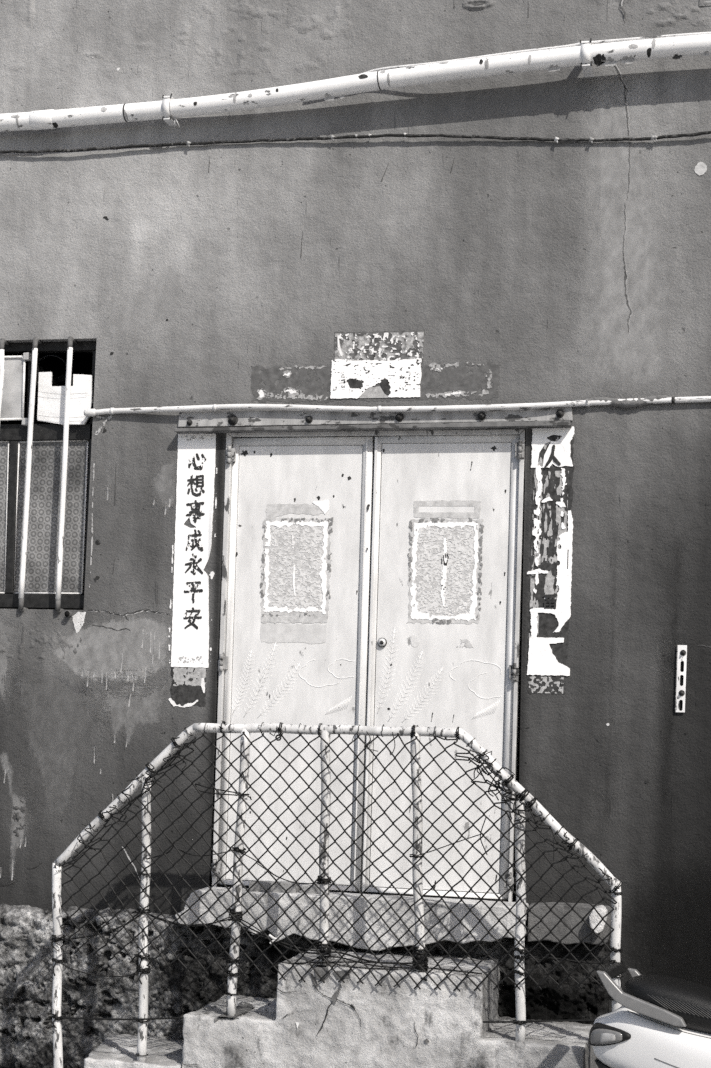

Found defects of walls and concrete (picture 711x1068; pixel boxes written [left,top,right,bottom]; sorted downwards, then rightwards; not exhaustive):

crack [615,64,632,332]
water stain [0,622,14,697]
water stain [19,617,170,813]
water stain [0,754,26,880]
crack [276,975,361,1036]